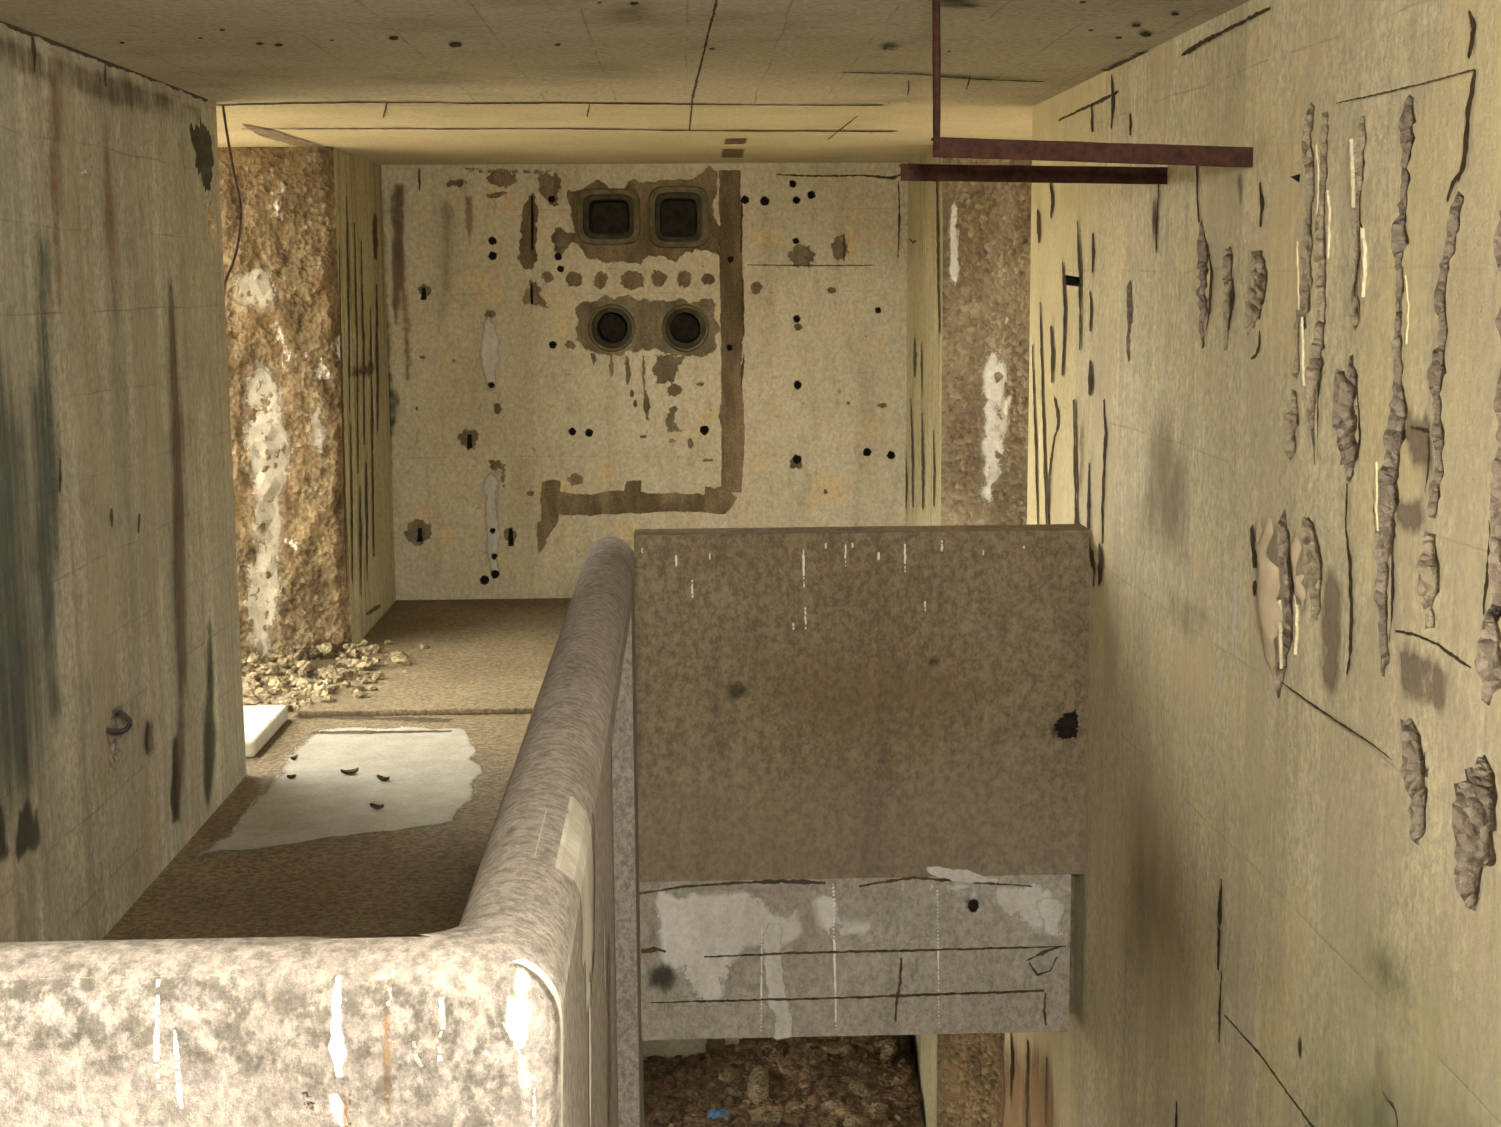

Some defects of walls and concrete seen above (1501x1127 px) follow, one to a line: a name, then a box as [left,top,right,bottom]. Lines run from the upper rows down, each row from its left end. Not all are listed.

leakage [0,39,168,207]
leakage [0,317,59,860]
leakage [171,284,186,695]
spalling [190,118,381,660]
peeling [446,138,763,553]
spalling [1284,94,1464,708]
leakage [171,724,185,821]
leakage [205,623,216,803]
spalling [1400,718,1429,846]
spalling [1452,754,1498,911]
crack [1217,879,1315,1127]
crack [1381,1090,1398,1127]